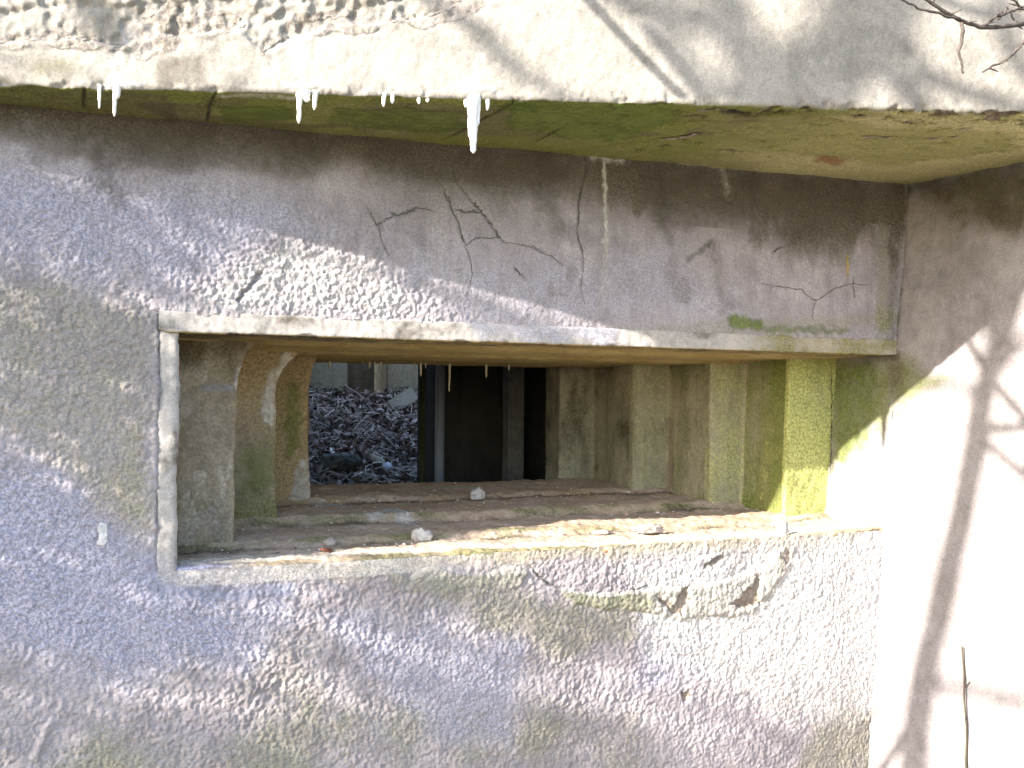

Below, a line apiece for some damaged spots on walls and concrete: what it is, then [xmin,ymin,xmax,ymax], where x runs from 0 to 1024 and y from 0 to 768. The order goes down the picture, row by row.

crack [367,156,589,303]
damp [591,156,624,257]
crack [761,279,871,316]
peeling [561,540,795,619]